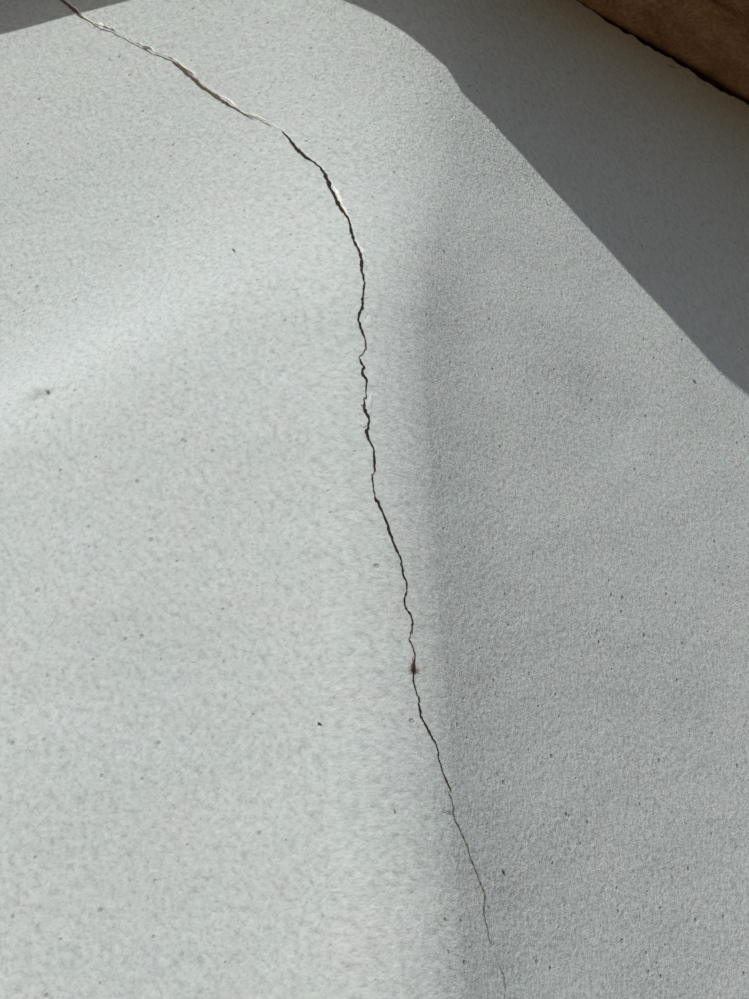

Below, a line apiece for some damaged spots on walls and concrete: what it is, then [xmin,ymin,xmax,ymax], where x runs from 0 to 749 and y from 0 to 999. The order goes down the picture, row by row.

crack [60,0,510,999]